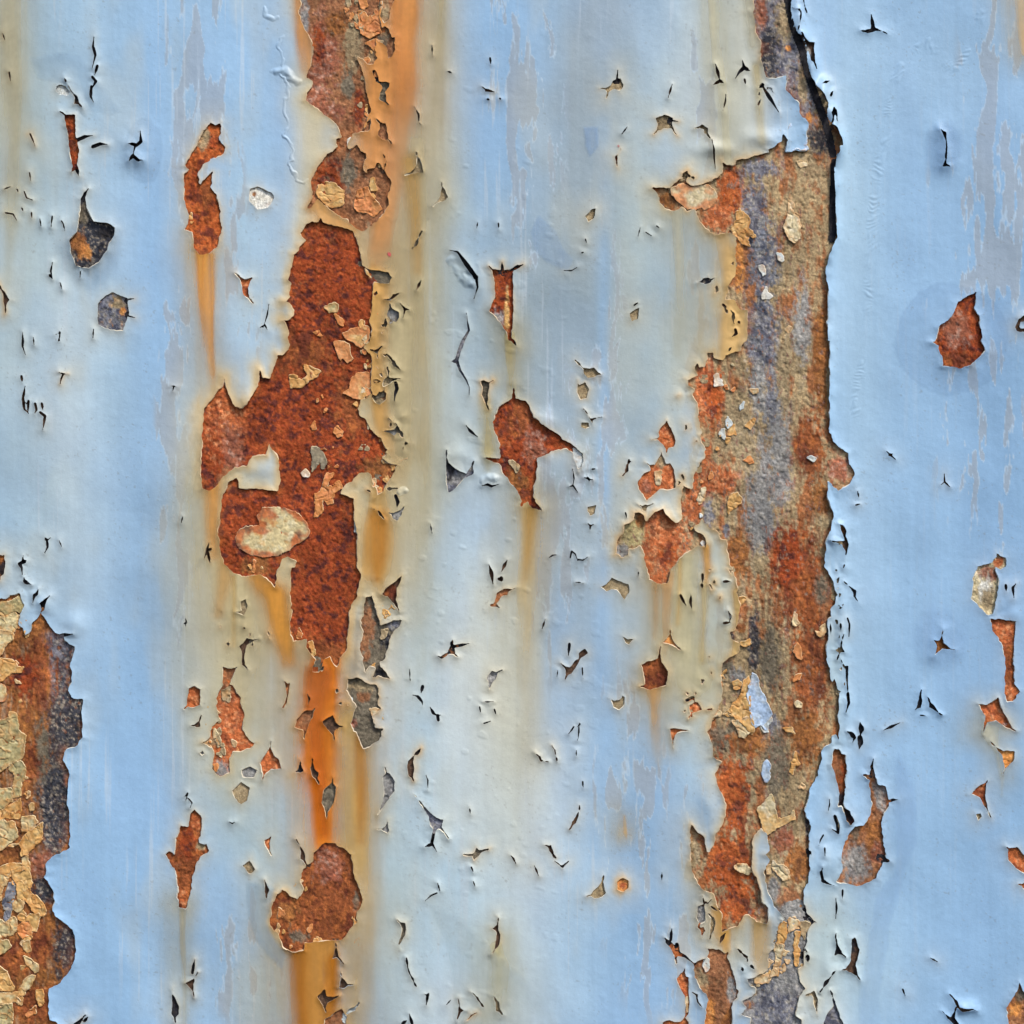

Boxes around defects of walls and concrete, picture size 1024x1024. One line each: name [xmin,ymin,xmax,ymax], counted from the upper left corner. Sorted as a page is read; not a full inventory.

peeling [69,188,115,268]
corrosion [194,249,213,375]
peeling [201,0,408,748]
corrosion [360,0,426,457]
corrosion [717,233,748,360]
crack [784,0,838,242]
corrosion [199,476,292,694]
corrosion [362,487,393,588]
corrosion [654,545,710,693]
peeling [617,0,898,1024]
peeling [971,554,1020,731]
peeling [0,594,83,1024]